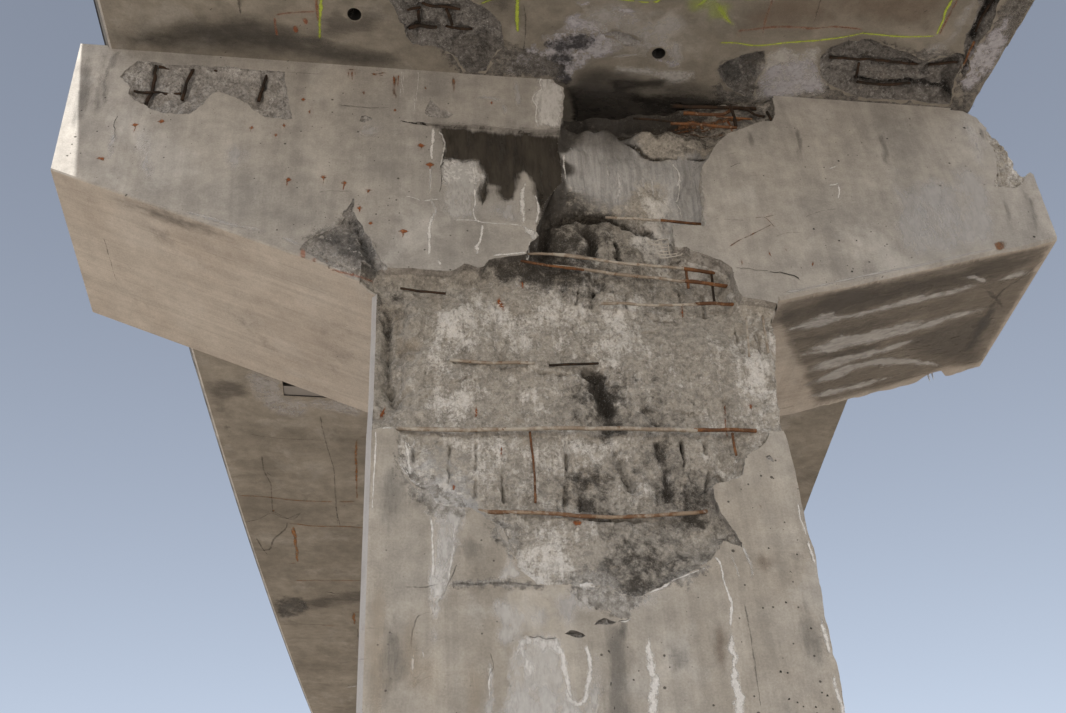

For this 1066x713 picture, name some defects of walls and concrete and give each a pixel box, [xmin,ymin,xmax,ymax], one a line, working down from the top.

spalling [120,61,292,120]
spalling [390,0,504,73]
leakage [430,14,733,260]
spalling [820,0,1000,110]
spalling [984,131,1026,188]
spalling [300,51,782,597]
leakage [785,249,1045,401]
leakage [507,638,597,713]